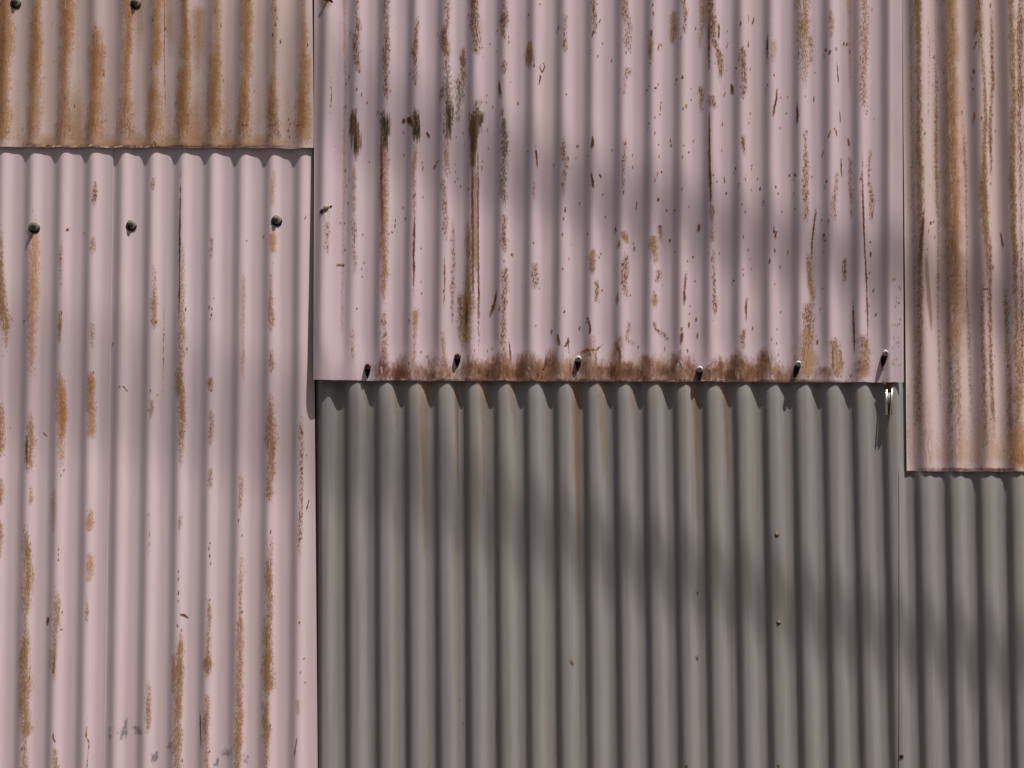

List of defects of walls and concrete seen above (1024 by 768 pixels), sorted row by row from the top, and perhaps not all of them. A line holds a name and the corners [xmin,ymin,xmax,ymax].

rust [0,233,40,372]
rust [22,373,67,476]
rust [0,0,312,148]
rust [176,185,188,462]
rust [437,0,511,145]
rust [377,74,901,399]
rust [648,0,764,321]
rust [910,0,1024,471]
rust [19,531,34,768]
rust [172,614,188,768]
rust [234,558,246,768]
rust [261,530,278,768]